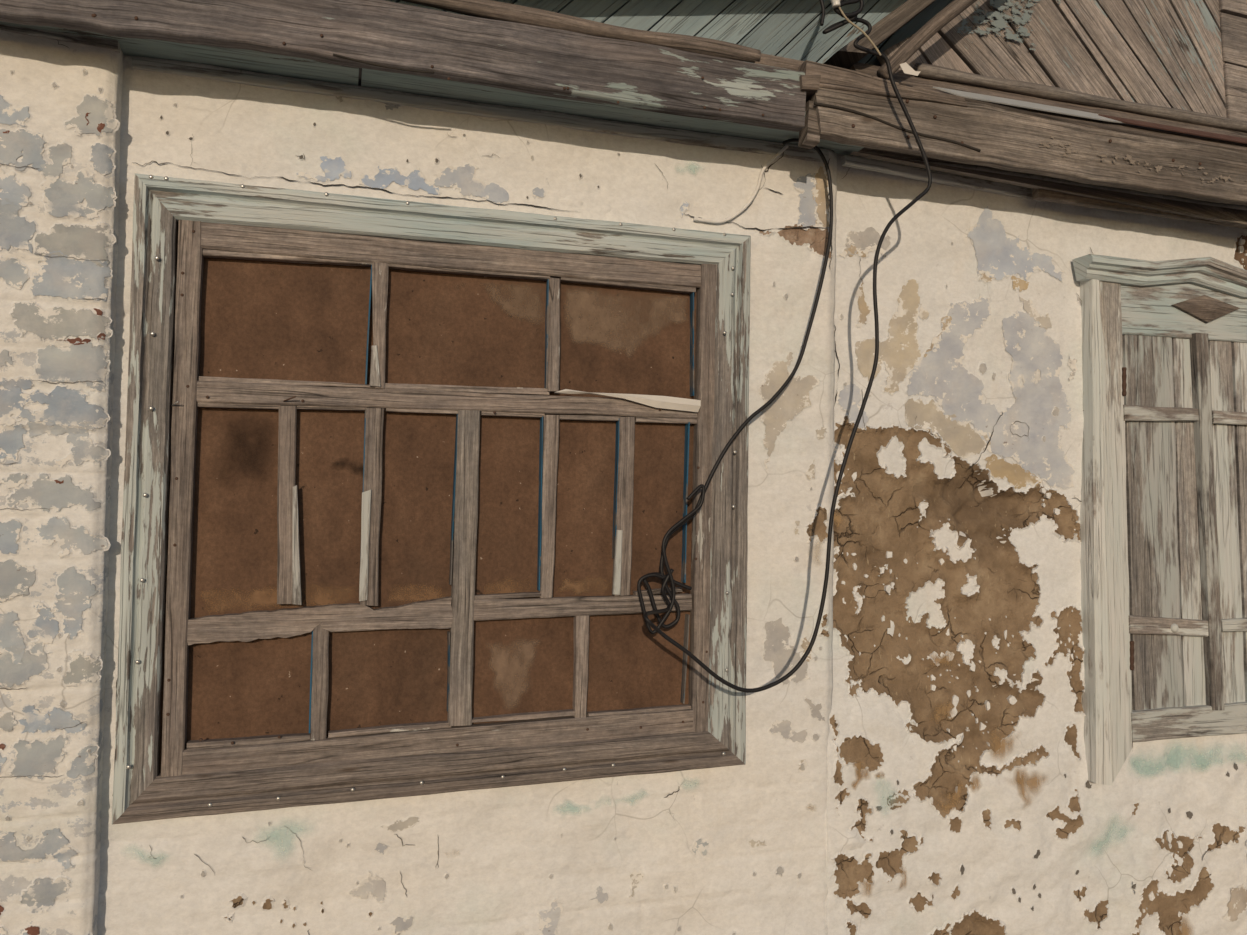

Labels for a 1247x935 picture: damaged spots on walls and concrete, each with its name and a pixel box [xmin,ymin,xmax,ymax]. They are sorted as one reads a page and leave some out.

crack [132,134,577,212]
peeling [358,157,510,207]
spalling [758,165,891,261]
spalling [1232,233,1247,270]
spalling [758,270,1092,935]
peeling [0,814,80,935]
spalling [221,893,308,929]
flaking render [367,910,414,935]
spalling [1072,868,1110,931]
spalling [1130,807,1247,935]